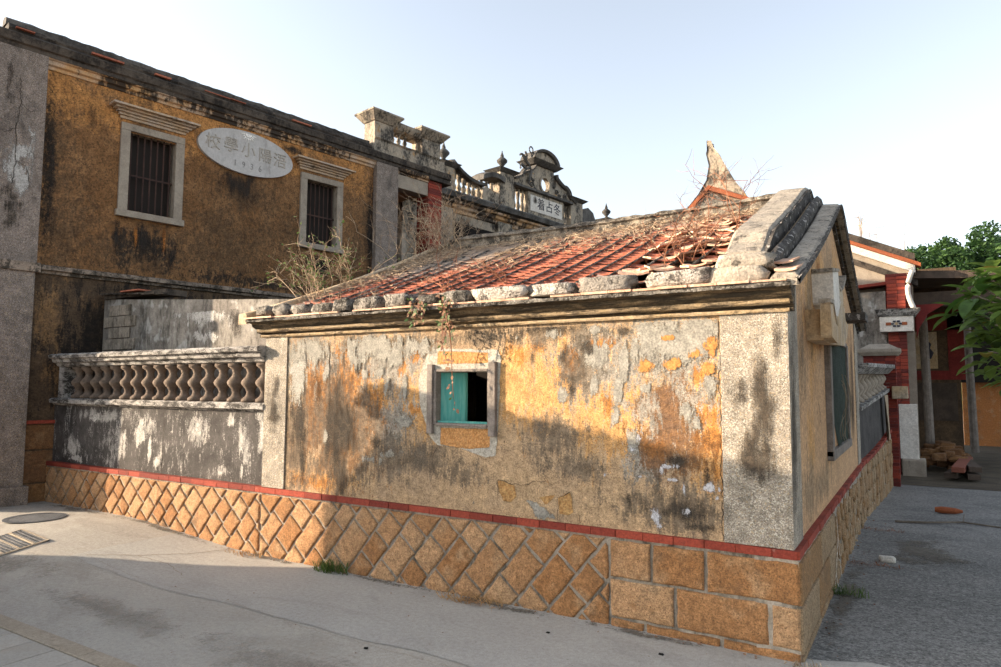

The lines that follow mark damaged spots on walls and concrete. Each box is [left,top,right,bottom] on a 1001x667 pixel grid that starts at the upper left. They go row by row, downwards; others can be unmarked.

crack [3,77,35,184]
peeling [3,126,39,197]
leakage [325,370,357,495]
peeling [288,333,437,428]
peeling [557,386,569,403]
peeling [582,319,718,458]
leakage [728,323,780,485]
leakage [791,343,803,519]
flaking render [498,481,573,520]